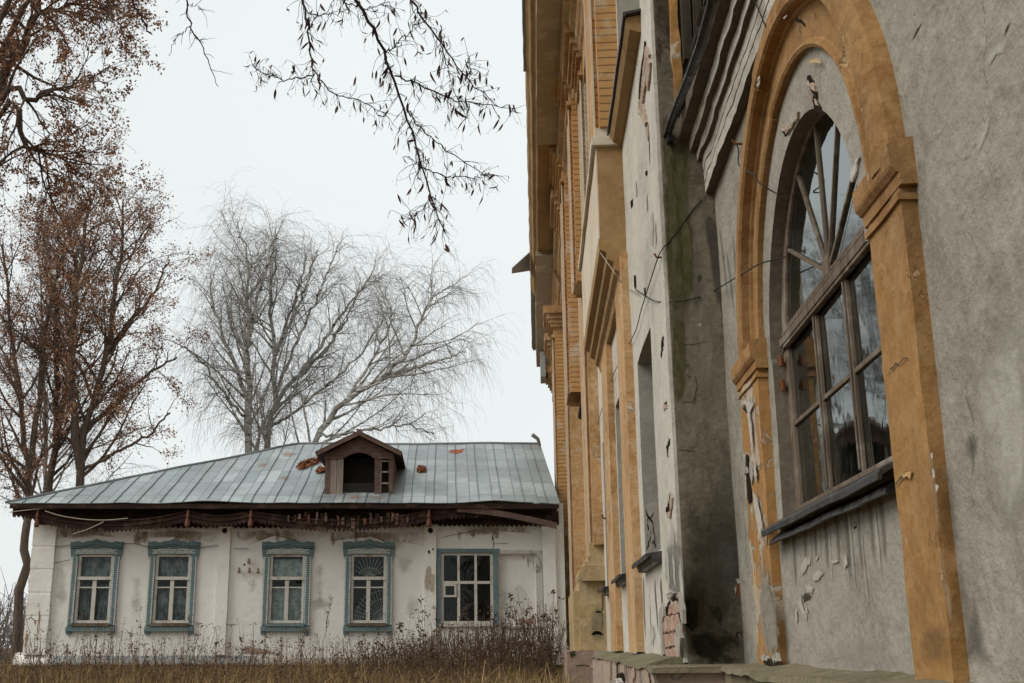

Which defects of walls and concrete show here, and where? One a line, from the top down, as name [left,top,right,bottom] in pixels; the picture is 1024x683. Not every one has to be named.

damp [663,119,713,398]
damp [706,217,723,316]
peeling [741,397,768,545]
flaking render [646,526,686,658]
damp [643,505,739,664]
flaking render [759,570,782,667]